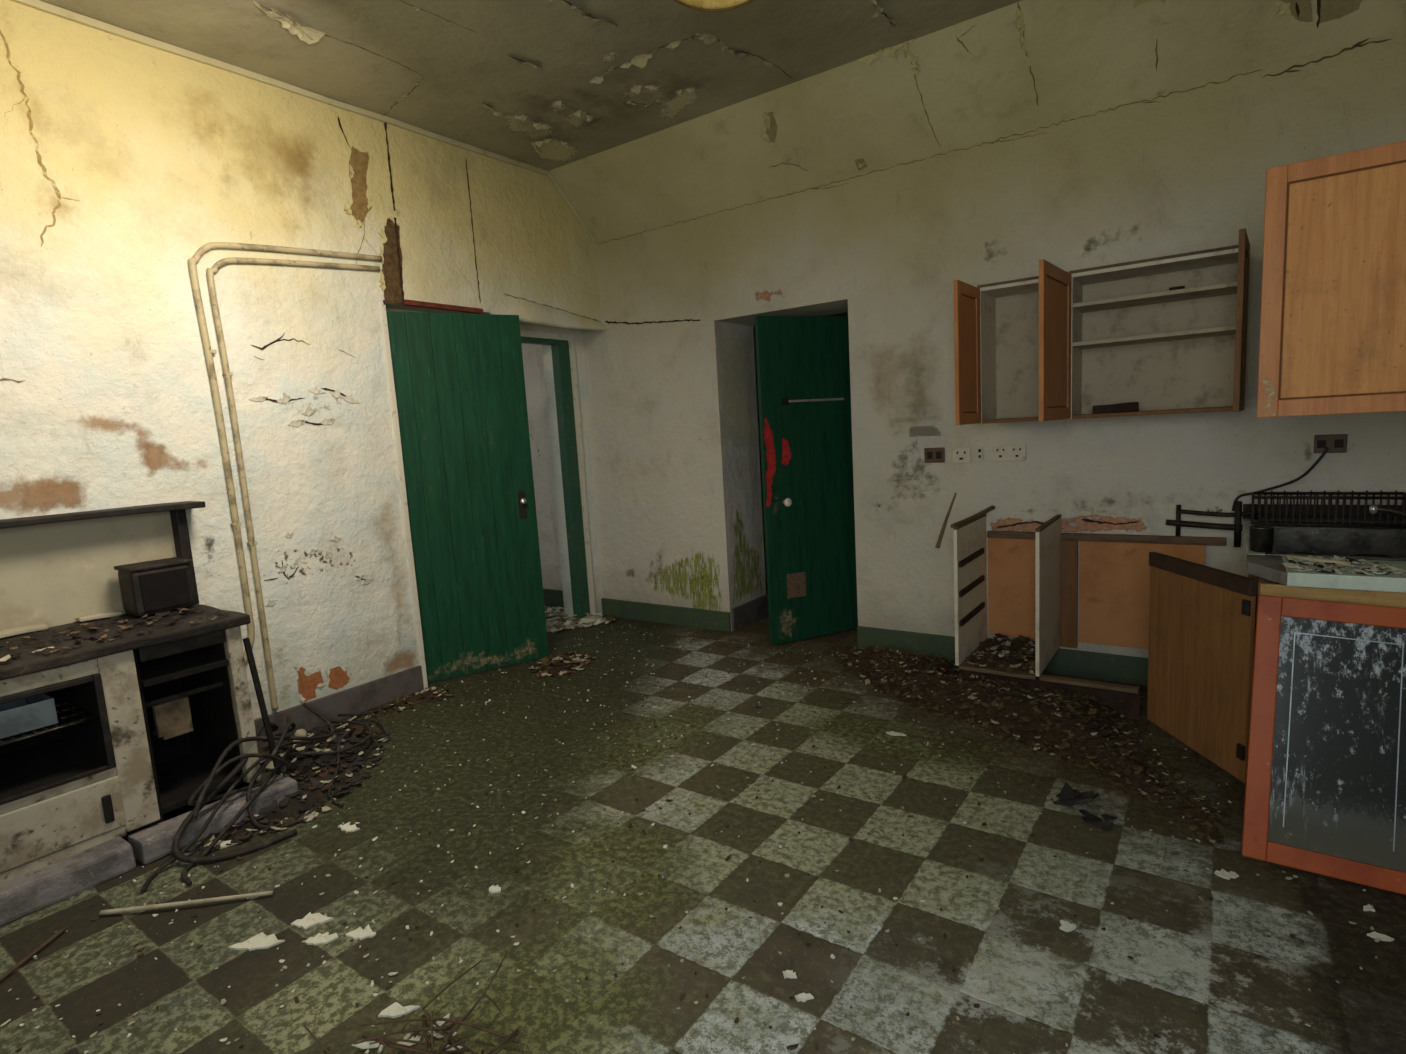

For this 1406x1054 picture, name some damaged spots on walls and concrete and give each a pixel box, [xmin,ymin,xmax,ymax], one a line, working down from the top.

peeling [1275,0,1362,28]
peeling [589,29,792,119]
crack [0,31,79,247]
peeling [482,100,596,164]
crack [598,22,1393,244]
peeling [338,117,400,291]
leakage [677,553,720,610]
spalling [295,663,352,703]